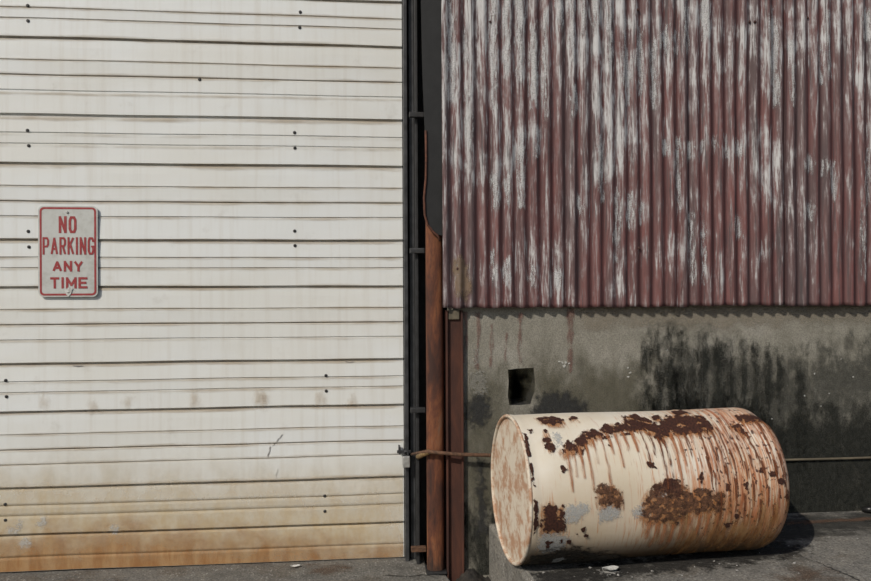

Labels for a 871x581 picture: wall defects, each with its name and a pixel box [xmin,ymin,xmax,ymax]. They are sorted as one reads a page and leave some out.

corrosion [452,255,472,302]
corrosion [411,449,491,459]
water stain [530,306,871,581]
corrosion [0,487,399,572]